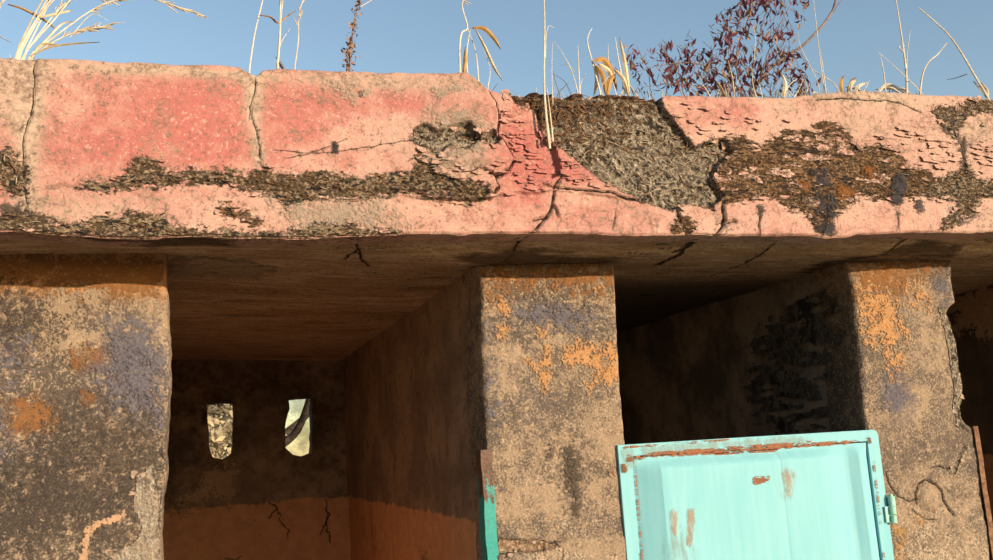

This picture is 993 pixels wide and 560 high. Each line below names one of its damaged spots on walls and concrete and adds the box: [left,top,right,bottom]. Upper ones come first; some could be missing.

spalling [0,145,32,197]
crack [20,61,36,204]
crack [249,76,411,167]
spalling [74,89,993,234]
spalling [0,200,400,238]
crack [345,238,370,266]
crack [654,203,734,266]
crack [712,217,801,276]
spalling [78,466,160,560]
crack [320,499,331,544]
rust [612,438,872,560]
crack [886,466,953,520]